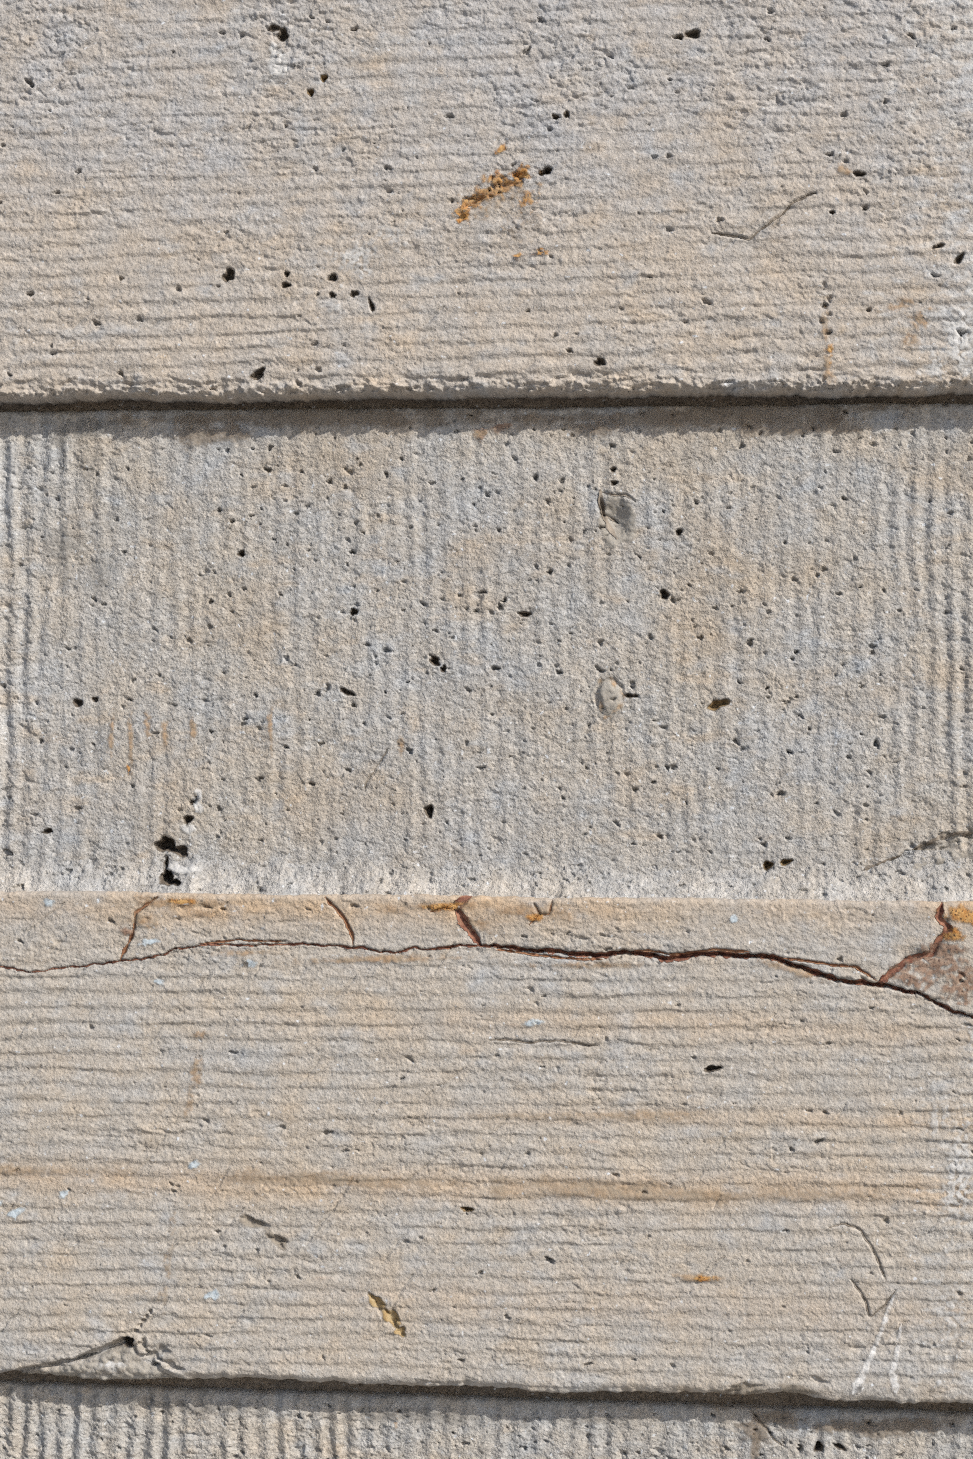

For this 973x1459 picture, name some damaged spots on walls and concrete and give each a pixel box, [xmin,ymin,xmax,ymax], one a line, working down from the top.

corrosion [455,145,541,223]
crack [0,895,973,1018]
corrosion [943,904,973,940]